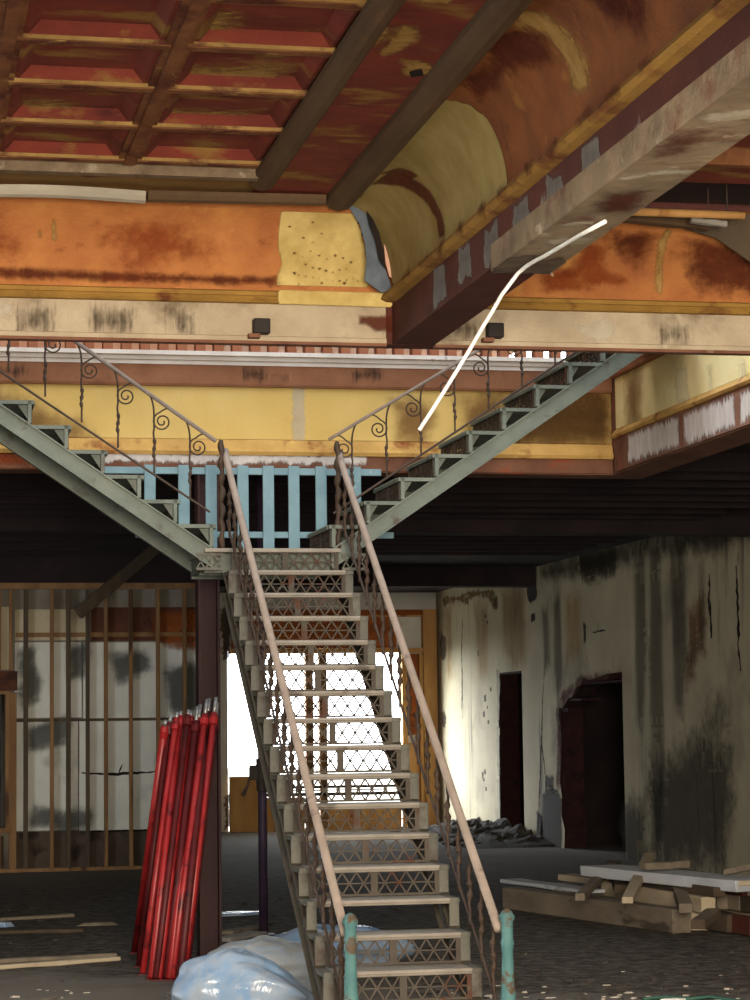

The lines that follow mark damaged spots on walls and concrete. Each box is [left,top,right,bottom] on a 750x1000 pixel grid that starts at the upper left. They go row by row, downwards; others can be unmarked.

rust [466,32,550,96]
peeling [581,136,600,171]
peeling [277,100,508,311]
peeling [512,195,529,227]
rust [0,268,274,285]
spalling [484,219,566,274]
water stain [94,313,126,329]
peeling [628,390,750,463]
crack [706,574,714,638]
crack [734,556,742,671]